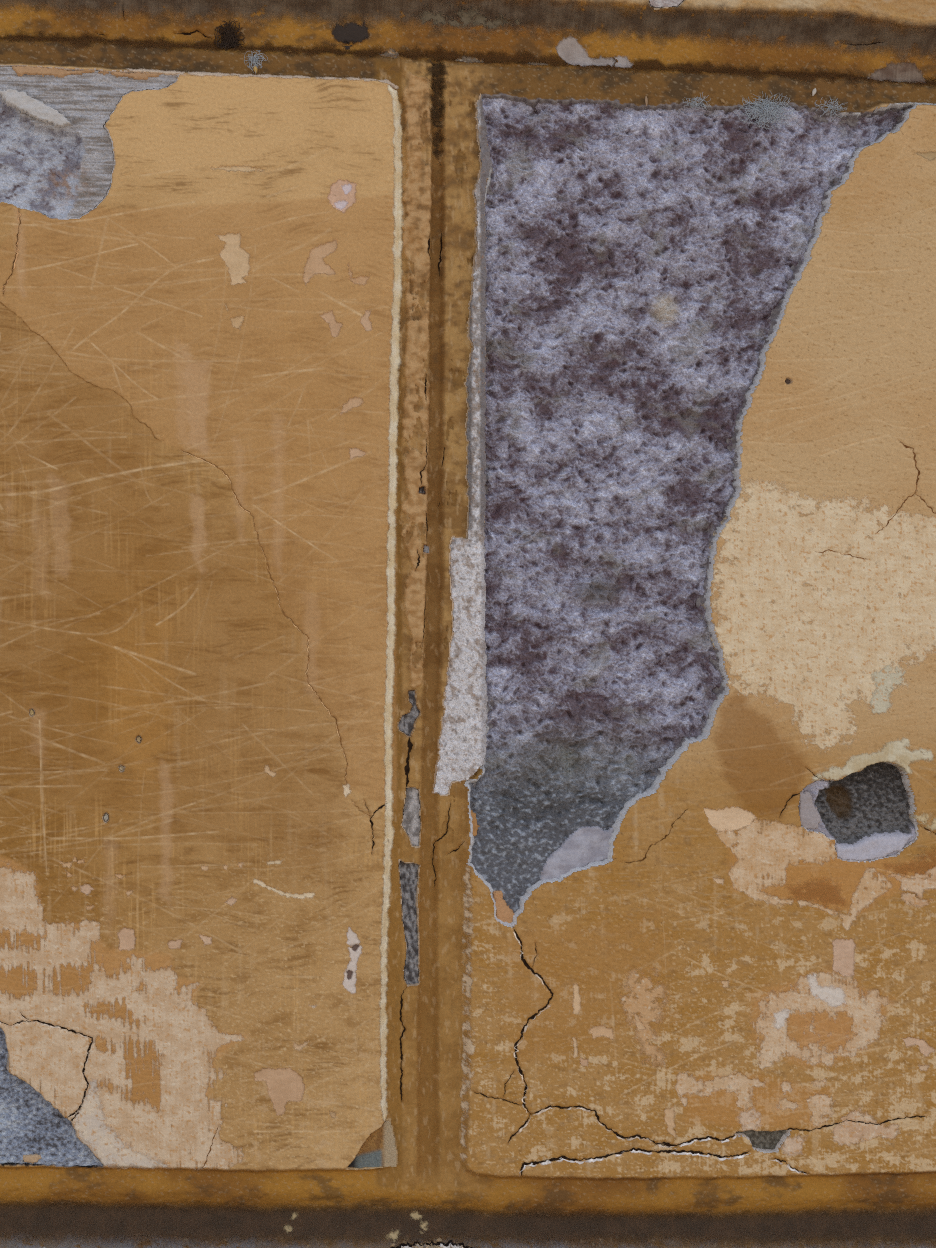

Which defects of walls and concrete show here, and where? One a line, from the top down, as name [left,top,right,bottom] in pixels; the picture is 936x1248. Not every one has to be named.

spalling [0,65,180,220]
crack [182,450,413,850]
spalling [397,93,936,987]
crack [819,441,934,559]
peeling [0,857,244,1170]
crack [391,1240,473,1248]
crack [474,929,806,1176]
crack [788,1116,925,1131]